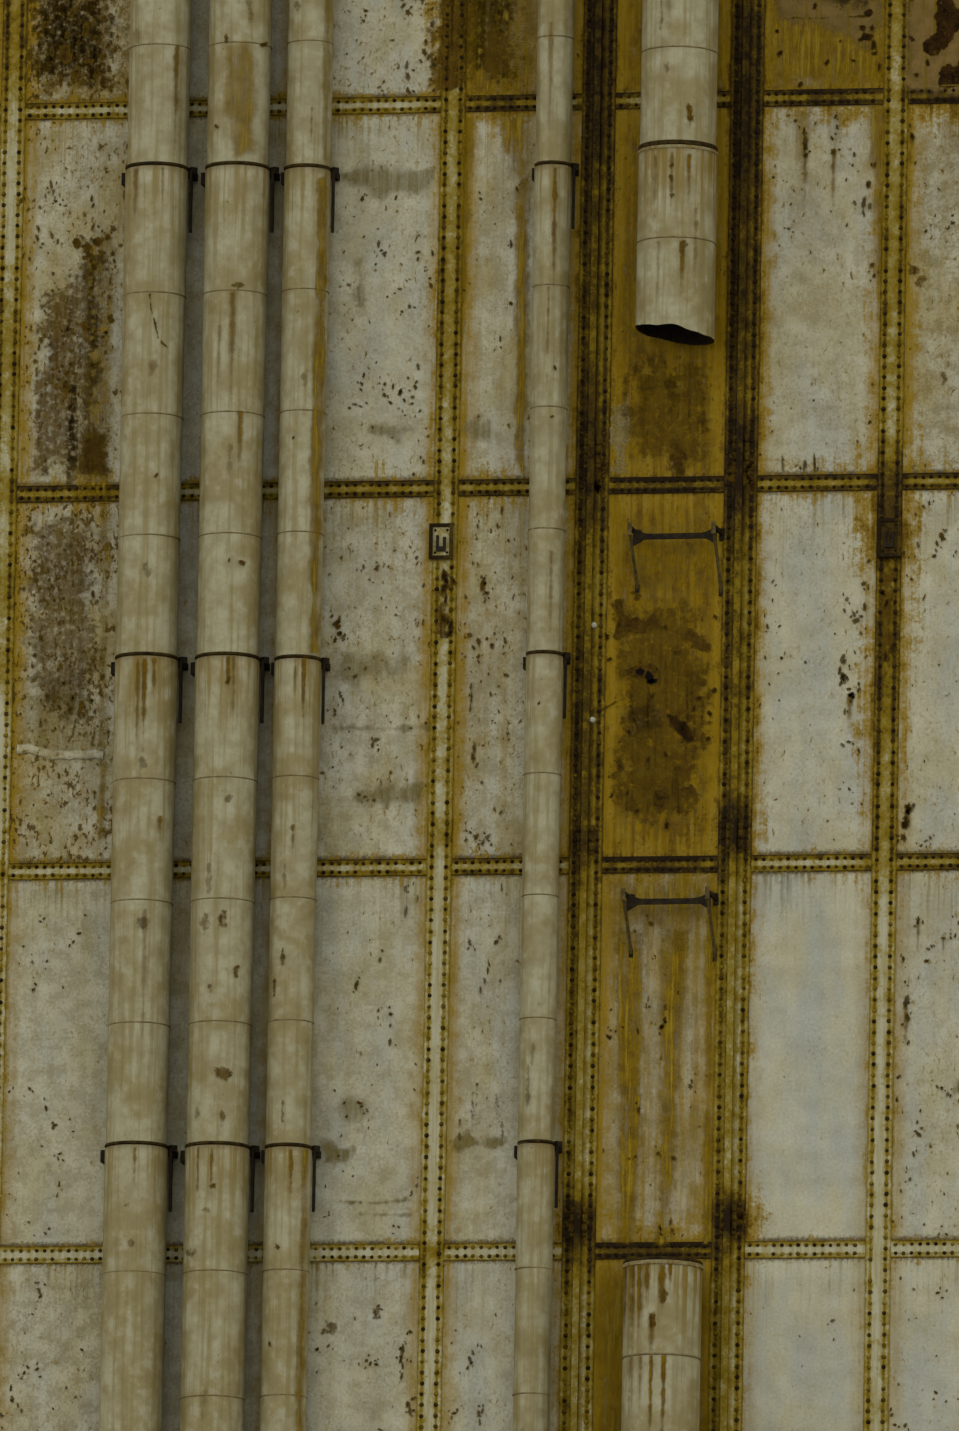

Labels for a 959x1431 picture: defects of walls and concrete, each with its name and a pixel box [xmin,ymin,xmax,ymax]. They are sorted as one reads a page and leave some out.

corrosion [24,0,117,99]
corrosion [397,0,532,200]
peeling [769,0,883,88]
peeling [905,0,959,95]
corrosion [494,113,530,472]
corrosion [17,195,116,839]